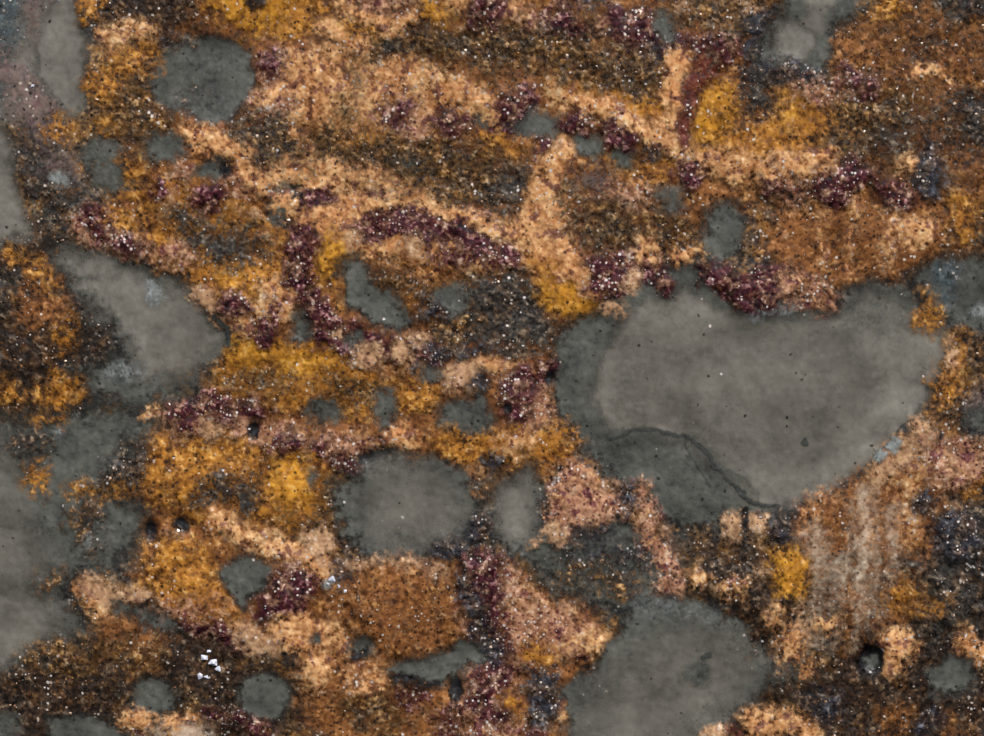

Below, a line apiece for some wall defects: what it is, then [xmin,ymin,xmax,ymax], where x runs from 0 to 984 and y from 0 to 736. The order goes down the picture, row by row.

corrosion [38,112,76,145]
corrosion [75,0,984,329]
corrosion [910,285,984,441]
corrosion [0,224,576,736]
crack [609,411,925,518]
corrosion [485,558,603,736]
corrosion [681,529,817,644]
corrosion [879,626,919,677]
corrosion [877,581,949,617]
corrosion [953,626,984,666]
corrosion [876,701,915,736]